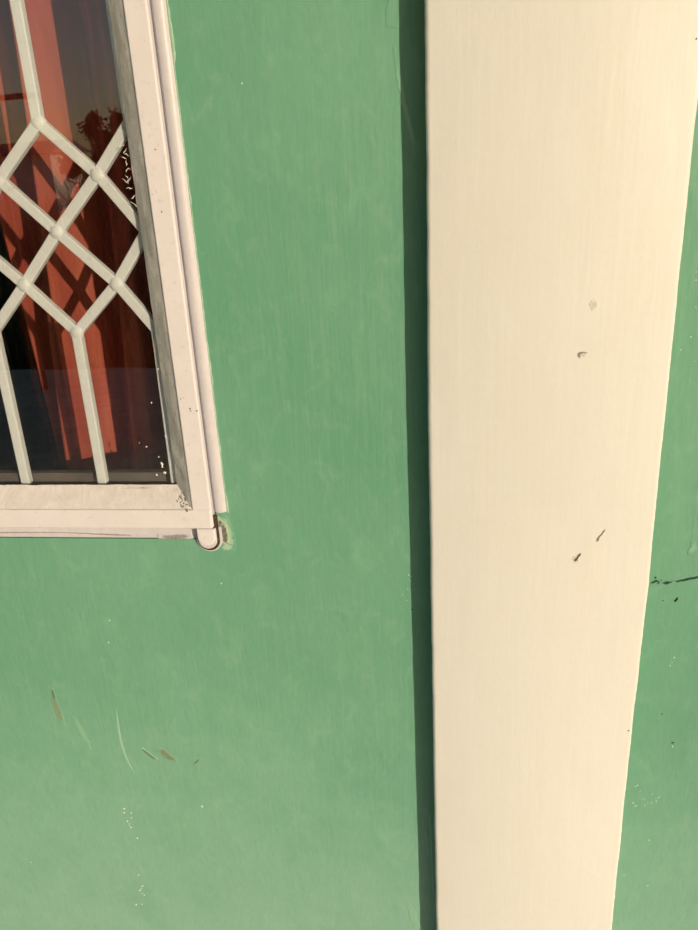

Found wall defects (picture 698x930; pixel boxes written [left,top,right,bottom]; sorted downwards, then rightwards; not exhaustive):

crack [650,575,698,586]